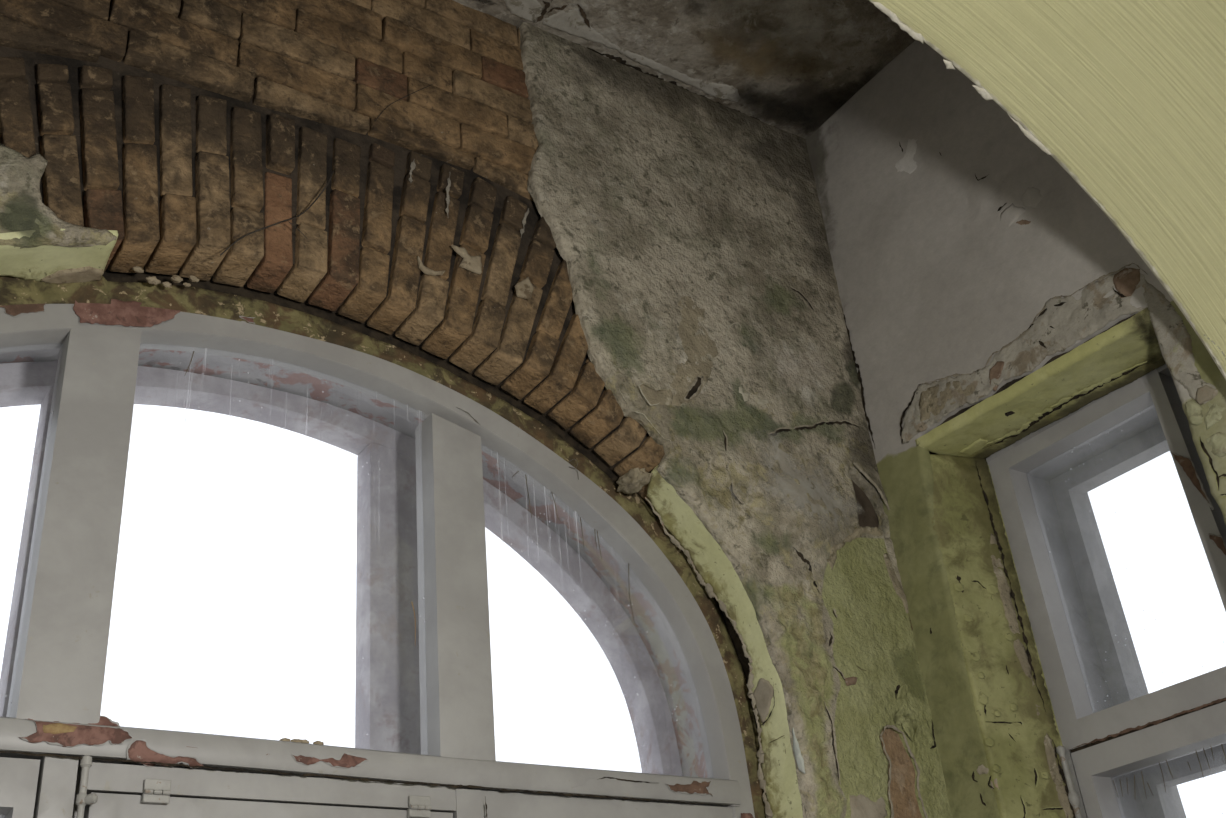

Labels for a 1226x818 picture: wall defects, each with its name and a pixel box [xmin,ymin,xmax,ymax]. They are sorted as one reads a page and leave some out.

crack [537,0,591,28]
water stain [739,88,858,130]
water stain [0,194,42,237]
water stain [417,245,482,276]
water stain [514,277,534,300]
peeling [72,299,181,328]
crack [762,286,875,446]
water stain [832,362,858,412]
spalling [900,263,1148,444]
spalling [645,497,805,818]
peeling [19,715,203,769]
peeling [292,753,369,768]